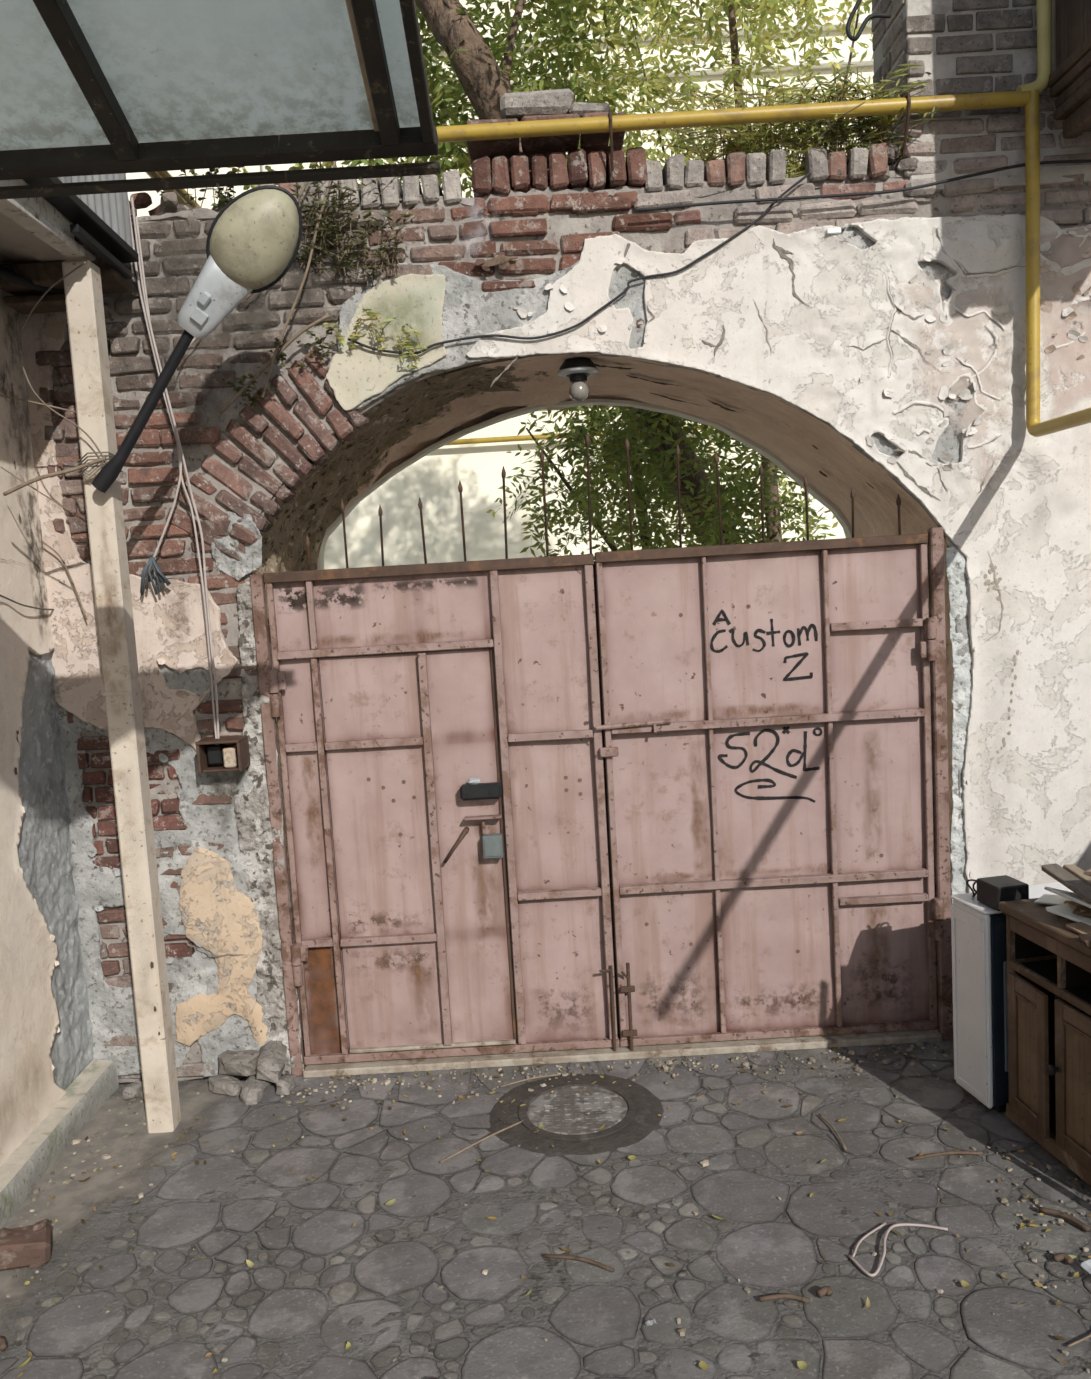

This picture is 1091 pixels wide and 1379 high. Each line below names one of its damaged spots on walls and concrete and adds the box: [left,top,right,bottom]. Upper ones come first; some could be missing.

crack [773,238,809,306]
crack [937,241,1026,278]
crack [702,325,725,357]
crack [853,271,941,382]
crack [893,448,995,501]
corrosion [394,579,475,589]
spalling [153,658,223,703]
spalling [945,547,1002,904]
flaking render [146,749,187,834]
spalling [209,511,304,1075]
spalling [15,650,134,1090]
corrosion [743,994,812,1006]